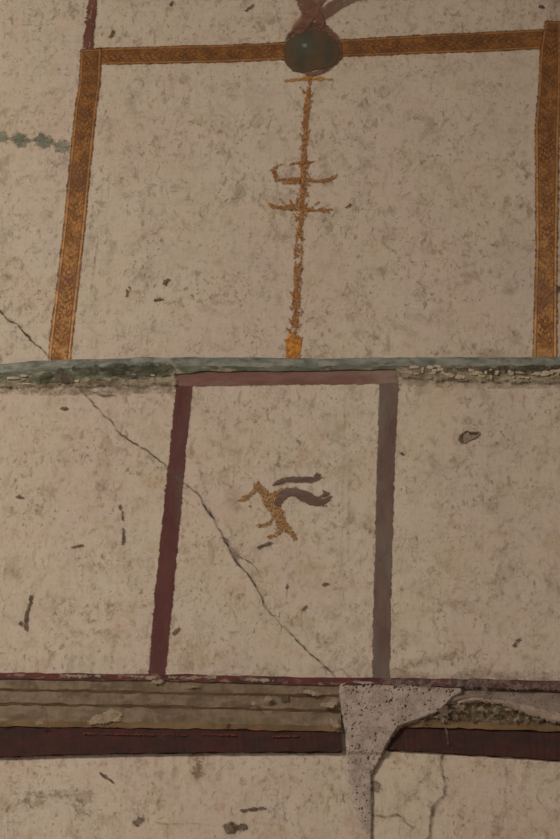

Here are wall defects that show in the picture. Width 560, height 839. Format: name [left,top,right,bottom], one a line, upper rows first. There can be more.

crack [0,311,46,353]
peeling [396,365,560,383]
crack [55,367,273,616]
crack [428,706,451,839]